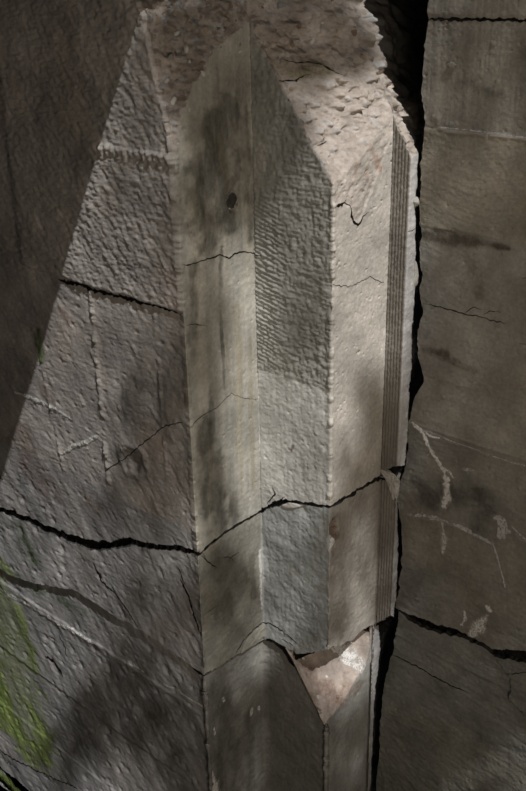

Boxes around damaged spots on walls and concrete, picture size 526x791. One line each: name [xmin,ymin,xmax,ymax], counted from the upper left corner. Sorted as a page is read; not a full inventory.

crack [428,16,526,24]
crack [335,200,368,226]
crack [186,251,261,266]
crack [59,279,201,326]
crack [408,359,416,382]
crack [376,466,404,479]
crack [0,507,237,634]
leakage [0,589,93,672]
crack [45,636,67,676]
crack [236,622,334,666]
crack [366,613,526,692]
leakage [0,671,52,769]